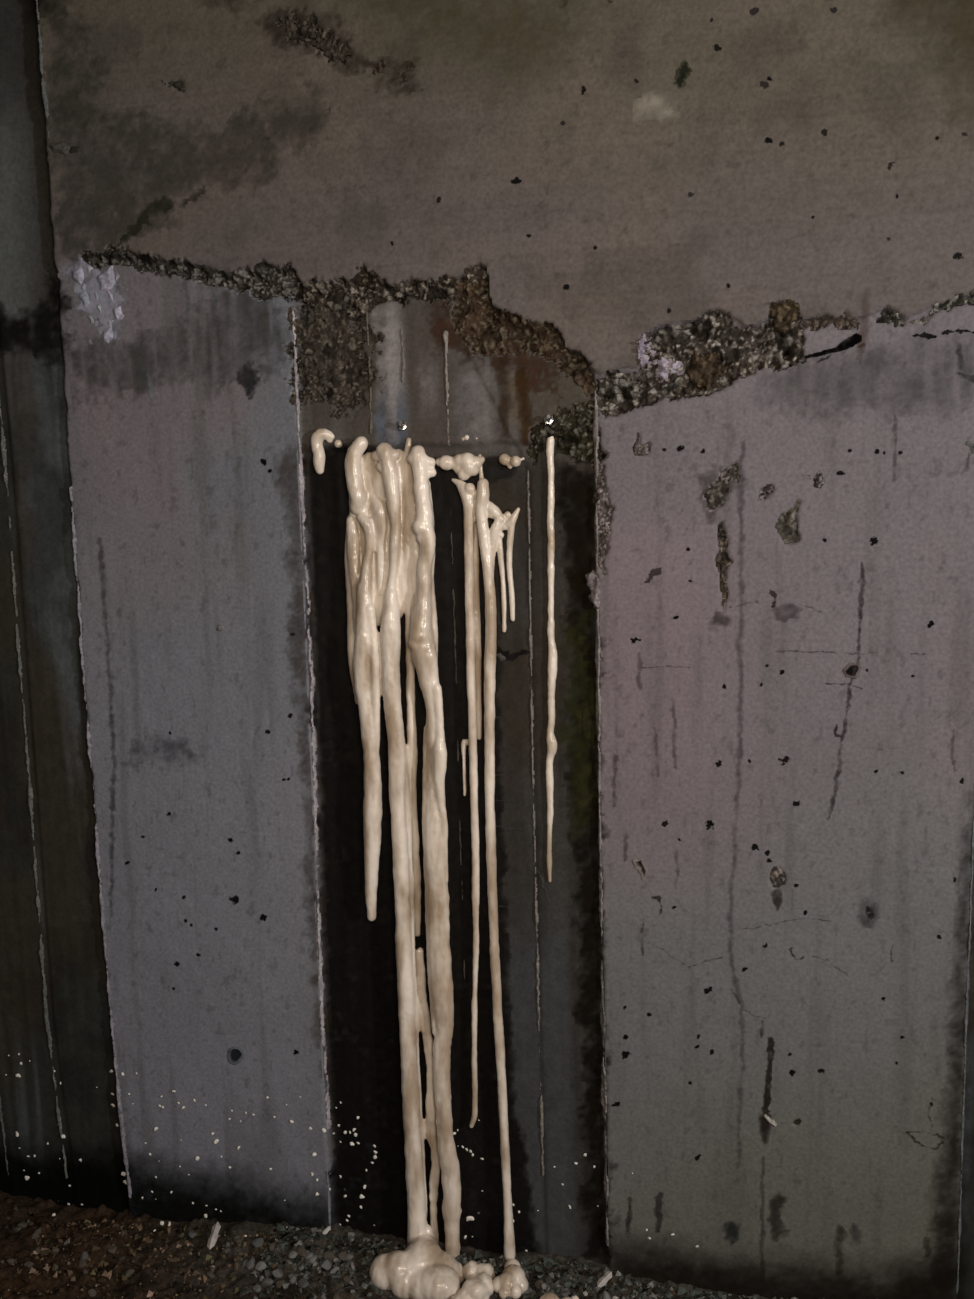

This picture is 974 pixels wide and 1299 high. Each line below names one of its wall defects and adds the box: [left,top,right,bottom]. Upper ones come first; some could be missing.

water stain [635,94,678,119]
water stain [118,198,189,247]
water stain [0,255,154,404]
peeling [637,333,685,383]
spalling [775,498,801,544]
spalling [714,522,734,624]